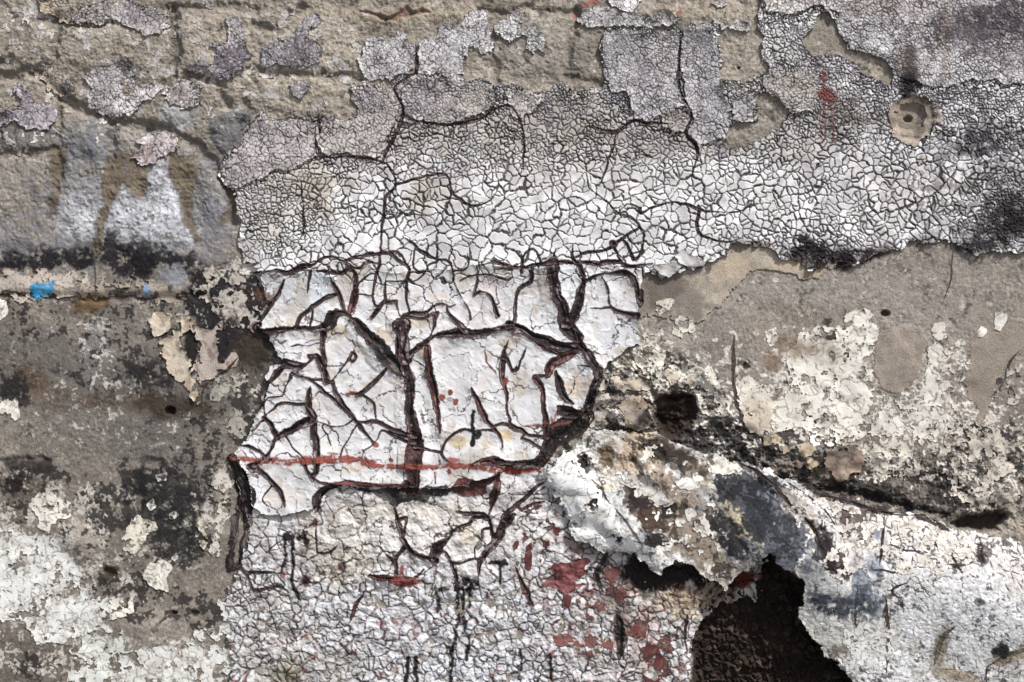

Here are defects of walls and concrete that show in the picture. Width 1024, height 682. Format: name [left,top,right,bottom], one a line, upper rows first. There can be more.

peeling [0,0,546,156]
peeling [131,132,179,166]
crack [218,0,1024,621]
crack [202,357,238,400]
peeling [0,242,1024,682]
crack [739,462,972,674]
crack [614,616,627,658]
crack [682,615,690,655]
crack [985,648,1024,682]